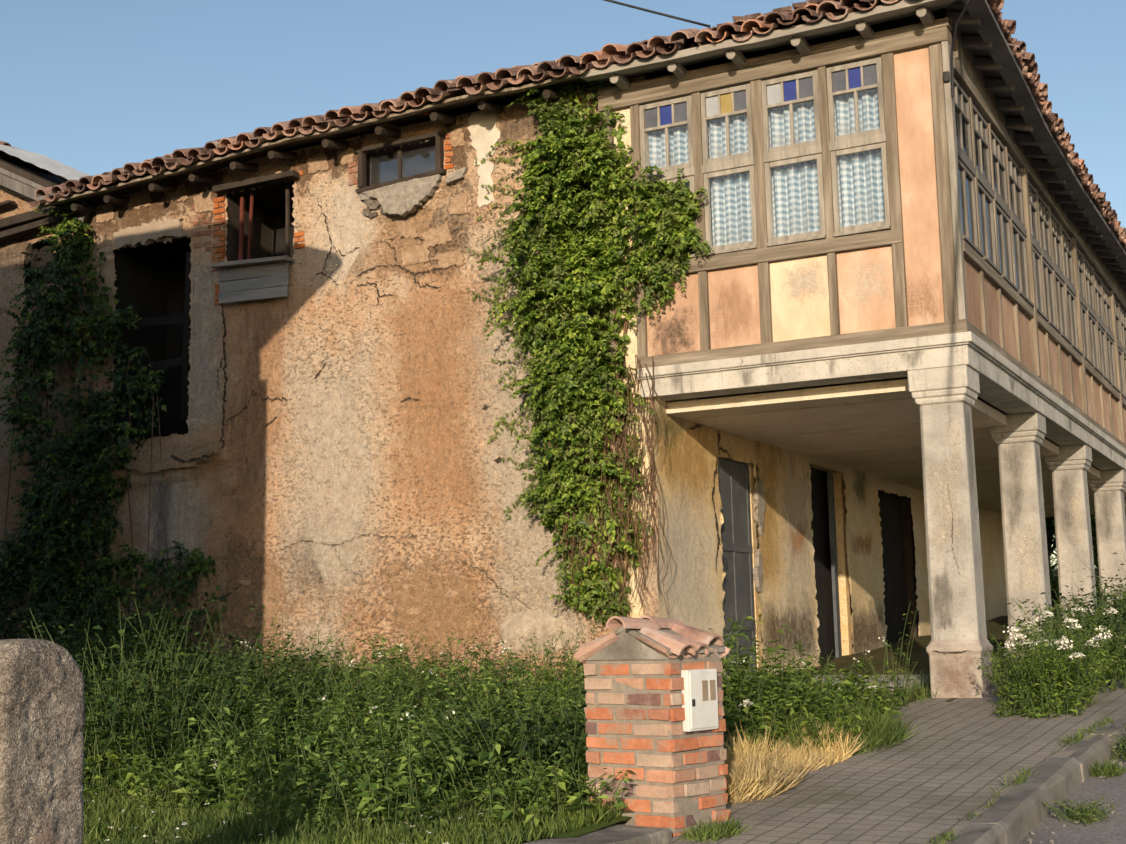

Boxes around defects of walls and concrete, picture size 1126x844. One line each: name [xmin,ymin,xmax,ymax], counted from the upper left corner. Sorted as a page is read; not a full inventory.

spalling [289,114,472,290]
crack [310,204,465,305]
crack [170,306,292,463]
crack [275,531,438,577]
crack [690,424,729,571]
crack [947,484,960,574]
damp [766,610,813,657]
damp [853,613,881,653]